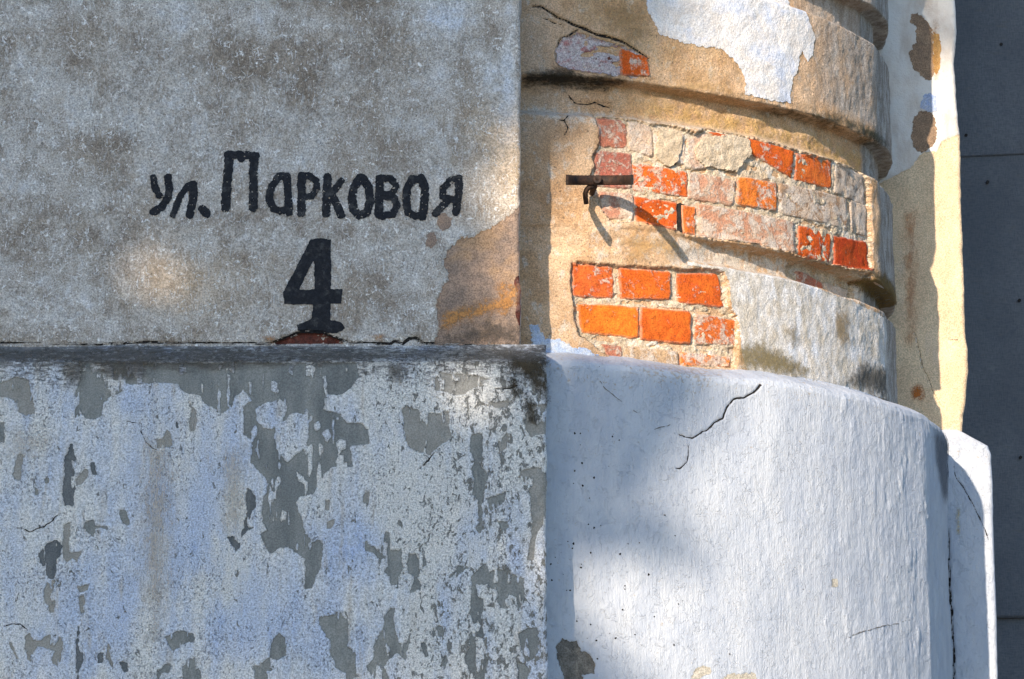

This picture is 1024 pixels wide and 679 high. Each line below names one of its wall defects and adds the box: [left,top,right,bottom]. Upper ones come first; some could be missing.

crack [532,6,649,59]
flaking render [909,13,941,80]
flaking render [435,205,521,346]
flaking render [570,110,968,432]
crack [600,381,762,469]
peeling [62,443,97,507]
peeling [75,362,370,589]
crack [954,472,988,538]
peeling [38,522,82,613]
peeling [365,532,426,599]
peeling [319,608,444,679]
peeling [449,564,525,679]